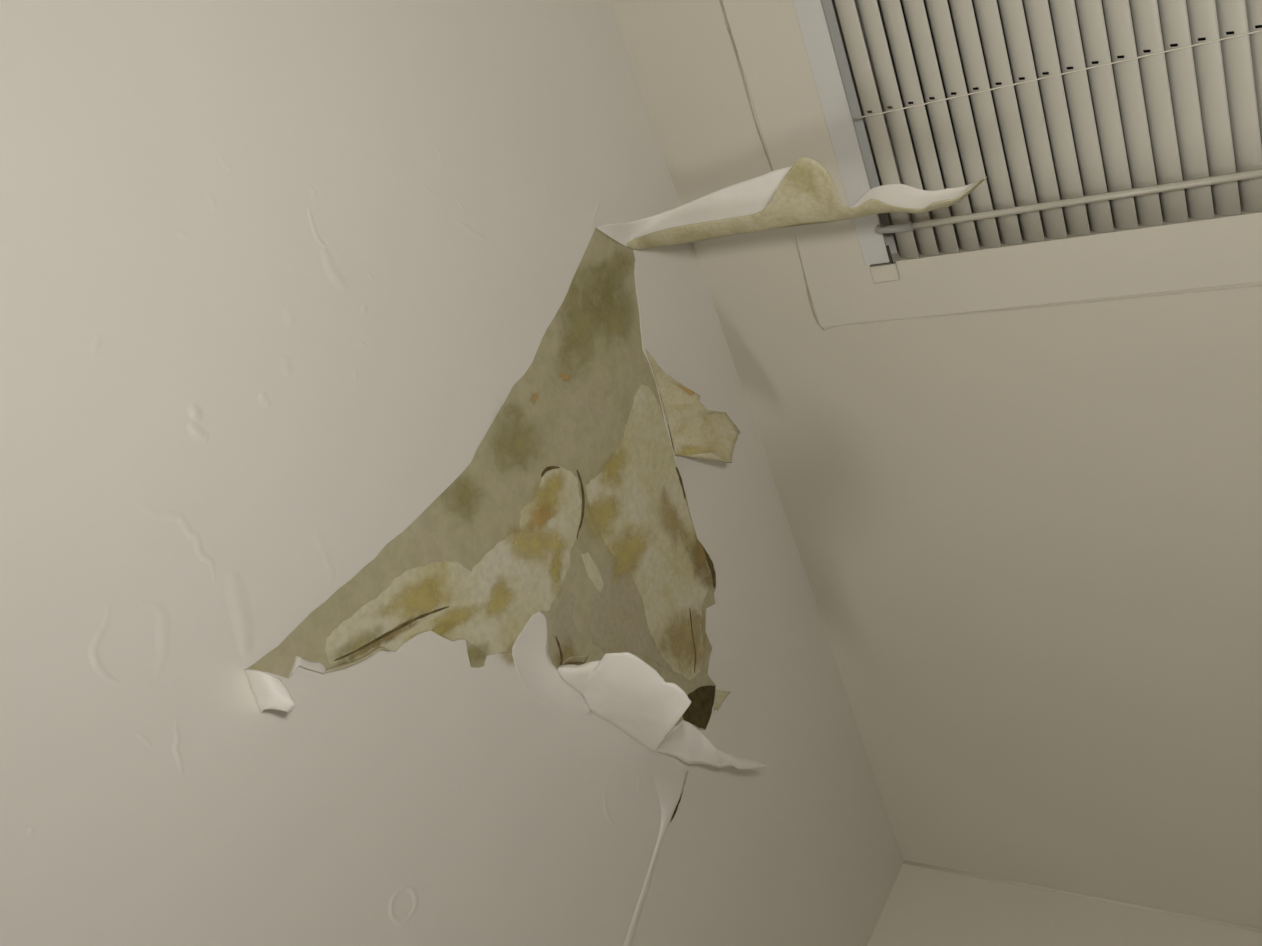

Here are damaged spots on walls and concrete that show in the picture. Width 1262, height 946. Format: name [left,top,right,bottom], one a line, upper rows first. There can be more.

peeling [247,228,731,730]